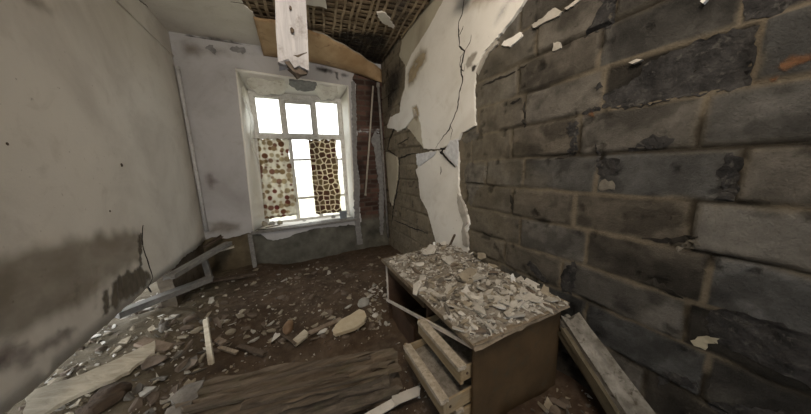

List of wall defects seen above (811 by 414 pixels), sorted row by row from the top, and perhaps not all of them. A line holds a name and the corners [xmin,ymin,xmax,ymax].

peeling [371,132,399,235]
crack [387,129,424,232]
crack [437,1,471,175]
peeling [387,0,527,253]
spalling [566,0,797,154]
spalling [714,152,744,201]
damp [93,234,151,314]
spalling [690,309,811,388]